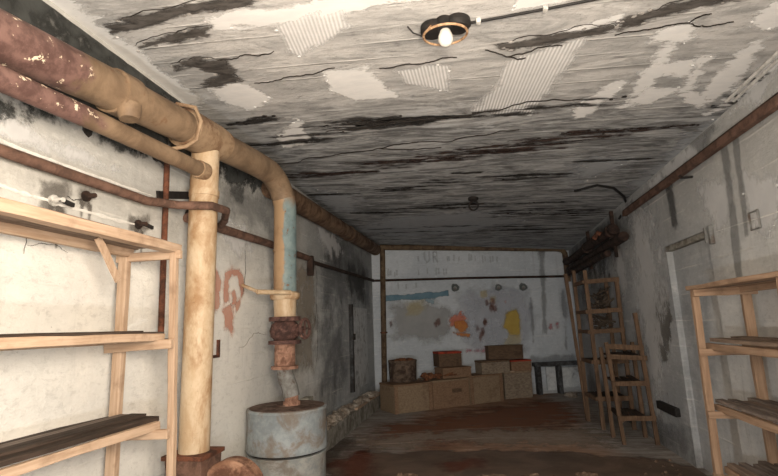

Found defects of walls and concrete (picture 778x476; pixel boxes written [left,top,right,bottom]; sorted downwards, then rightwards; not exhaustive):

crack [615,13,734,36]
crack [218,51,274,60]
crack [379,57,457,69]
crack [485,45,562,60]
crack [254,67,335,84]
water stain [247,98,614,146]
water stain [287,124,698,179]
water stain [375,172,573,192]
water stain [295,267,316,370]
water stain [326,440,707,476]